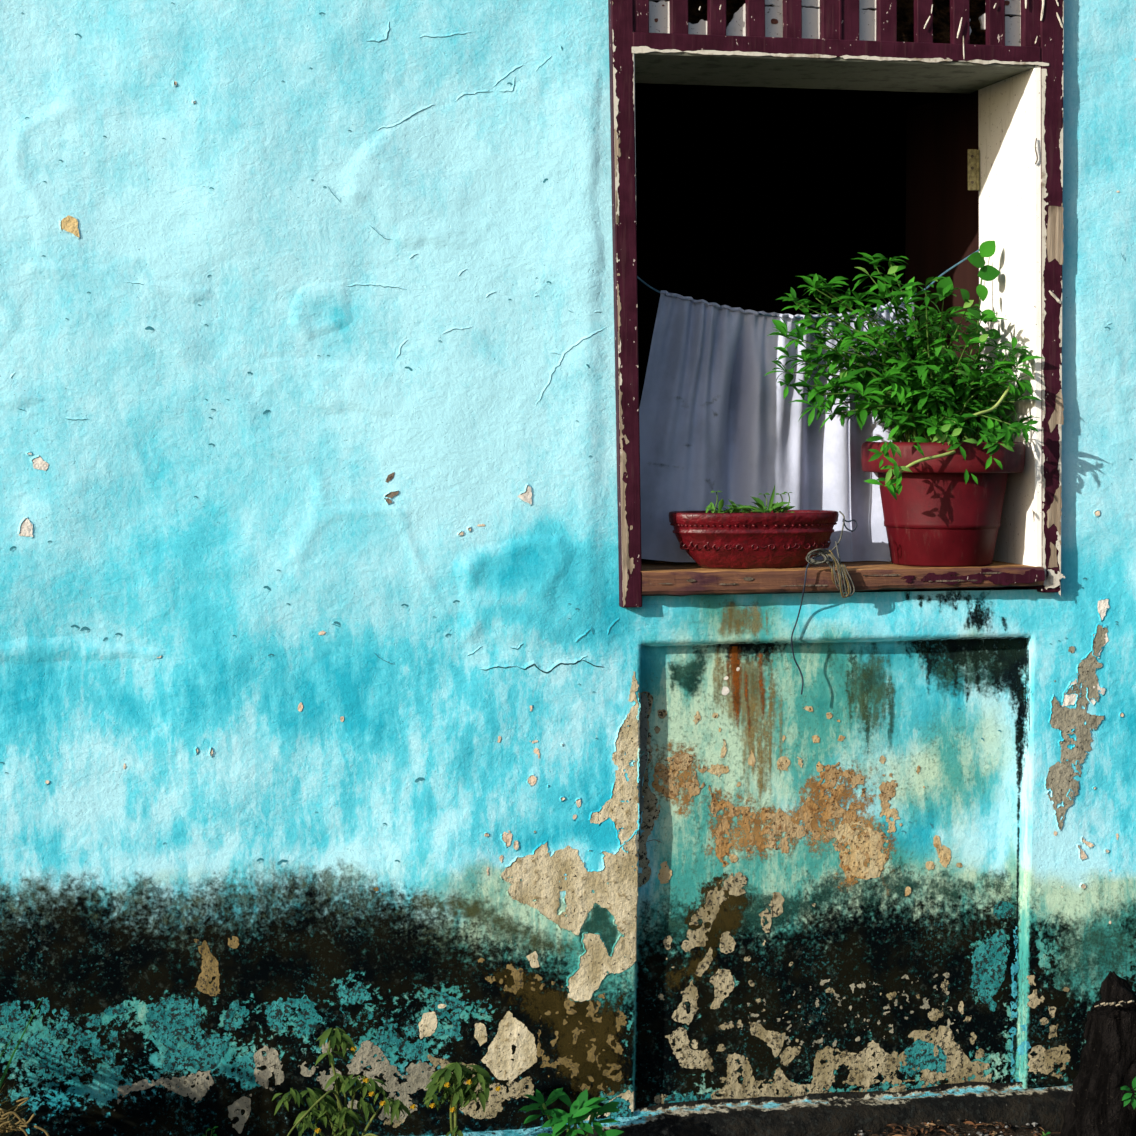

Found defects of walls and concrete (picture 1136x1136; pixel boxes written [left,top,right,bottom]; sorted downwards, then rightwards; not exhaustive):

peeling [59,215,82,239]
peeling [0,939,284,1134]
peeling [228,936,239,949]
peeling [263,995,322,1038]
crack [467,618,619,673]
water stain [0,589,1136,1136]
peeling [298,671,992,1128]
corrosion [651,742,699,814]
corrosion [704,602,896,890]
peeling [970,901,1071,1082]
peeling [1044,598,1119,836]
peeling [1076,833,1119,861]